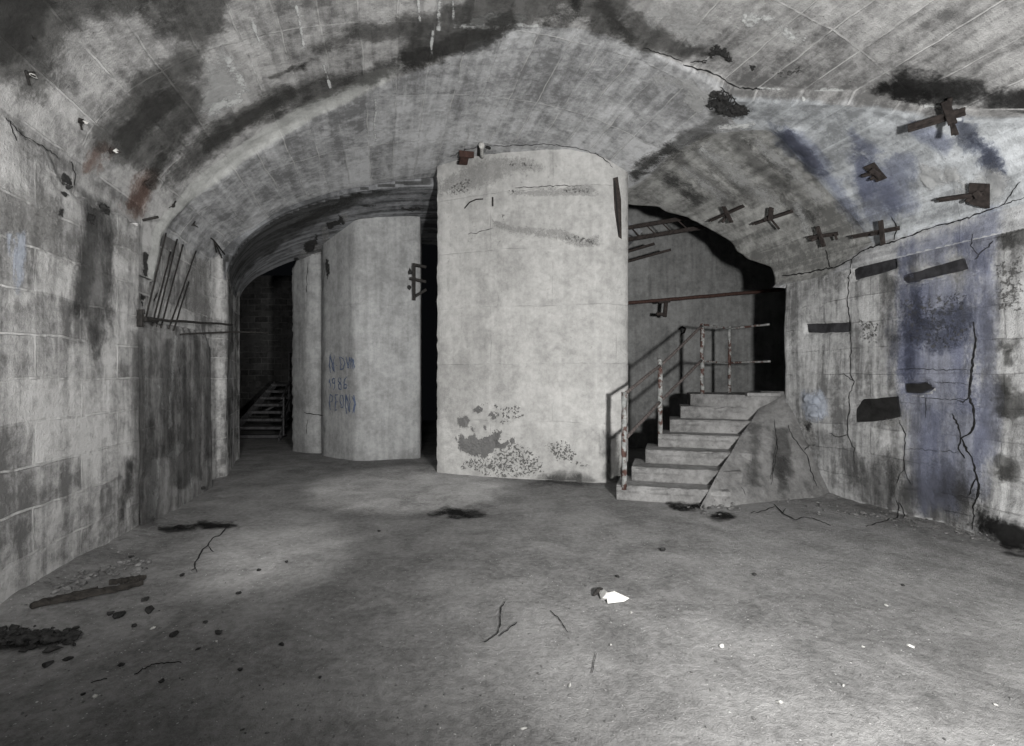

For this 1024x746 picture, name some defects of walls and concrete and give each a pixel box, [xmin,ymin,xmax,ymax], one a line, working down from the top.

water stain [201,52,248,115]
crack [645,48,777,112]
spalling [706,90,749,117]
water stain [879,72,1024,109]
crack [6,118,76,185]
crack [781,182,1023,463]
peeling [455,404,543,479]
peeling [548,440,584,466]
crack [741,420,831,526]
crack [866,322,980,530]